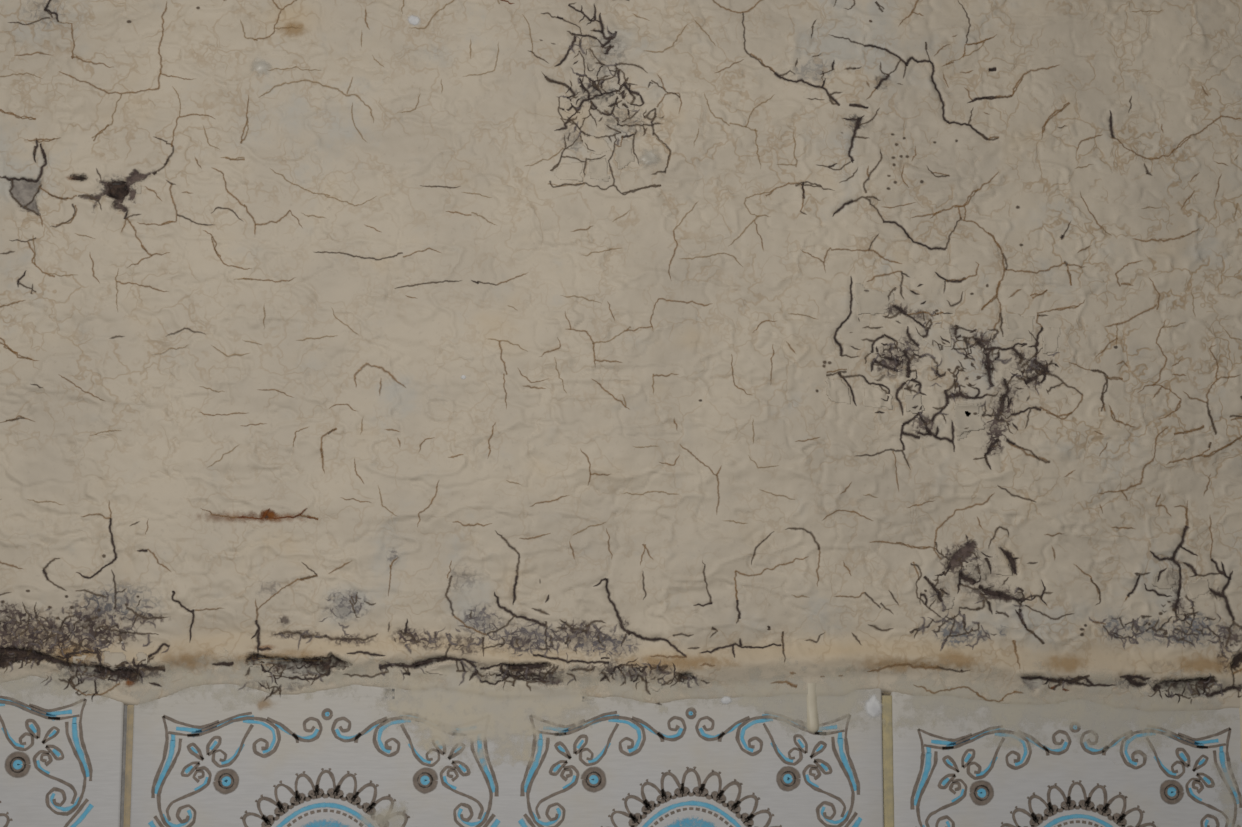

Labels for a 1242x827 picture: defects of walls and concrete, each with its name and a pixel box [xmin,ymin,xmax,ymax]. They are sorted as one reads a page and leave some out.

crack [0,0,523,338]
crack [156,311,265,356]
crack [343,0,1242,662]
crack [0,338,104,401]
crack [293,363,405,470]
rust [202,508,318,520]
mould [0,598,162,654]
crack [0,501,219,666]
crack [257,559,396,648]
mould [398,629,440,648]
mould [455,608,606,653]